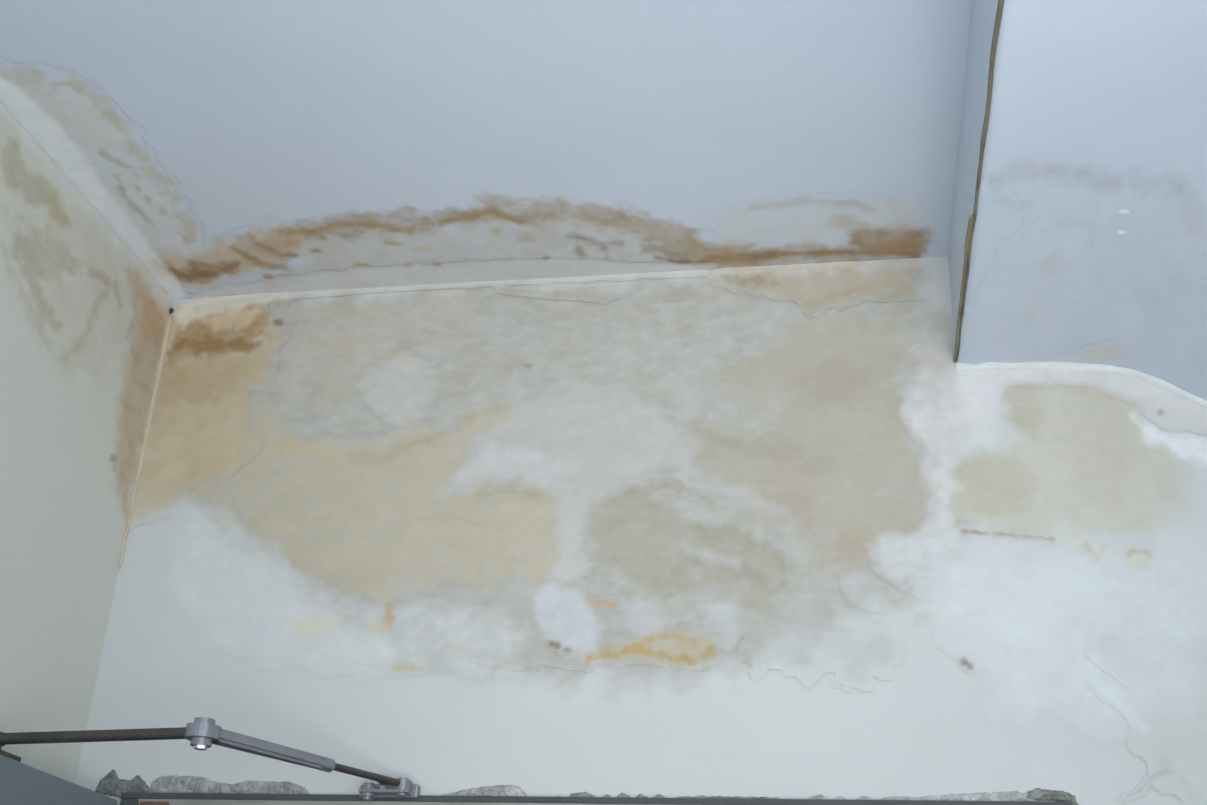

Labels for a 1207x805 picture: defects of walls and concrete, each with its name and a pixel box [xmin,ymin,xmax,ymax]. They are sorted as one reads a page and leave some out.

water stain [0,57,206,276]
water stain [0,100,1207,712]